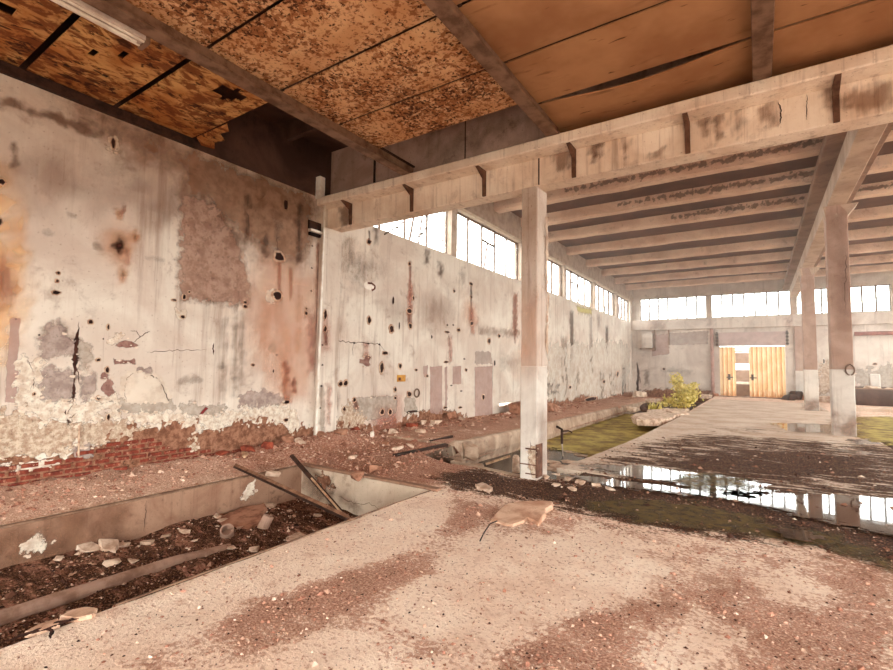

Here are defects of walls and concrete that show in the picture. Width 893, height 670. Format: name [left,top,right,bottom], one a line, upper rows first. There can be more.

water stain [3,98,98,136]
flaking render [76,104,317,321]
spalling [565,139,823,192]
spalling [617,171,814,206]
spalling [671,197,804,220]
corrosion [113,234,138,255]
crack [64,323,80,426]
spalling [0,318,314,487]